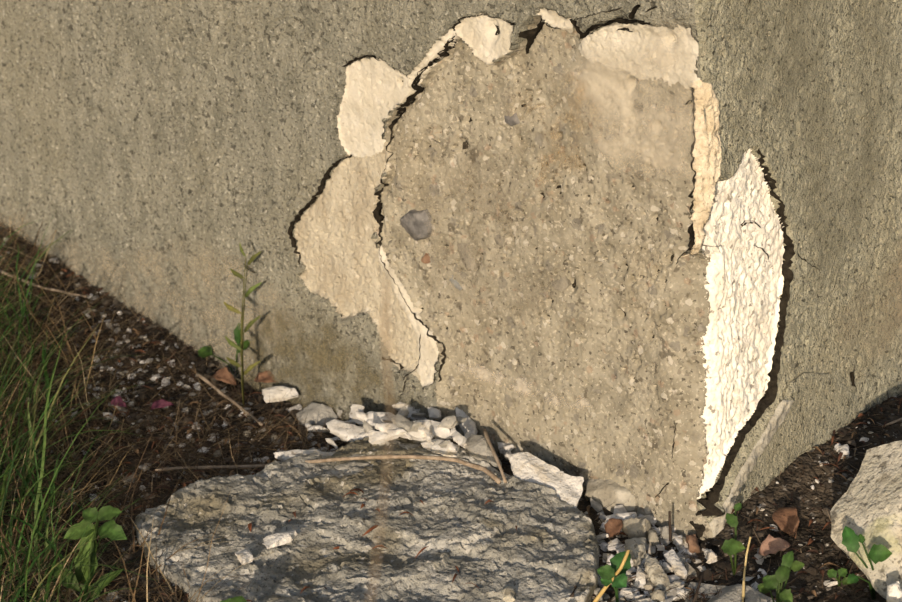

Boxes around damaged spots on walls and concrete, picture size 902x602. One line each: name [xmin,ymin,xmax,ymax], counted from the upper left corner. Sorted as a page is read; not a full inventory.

crack [342,55,380,67]
crack [288,154,352,265]
crack [373,4,657,401]
flaking render [294,8,785,579]
crack [676,87,718,264]
crack [689,149,821,538]
flaking render [273,449,335,461]